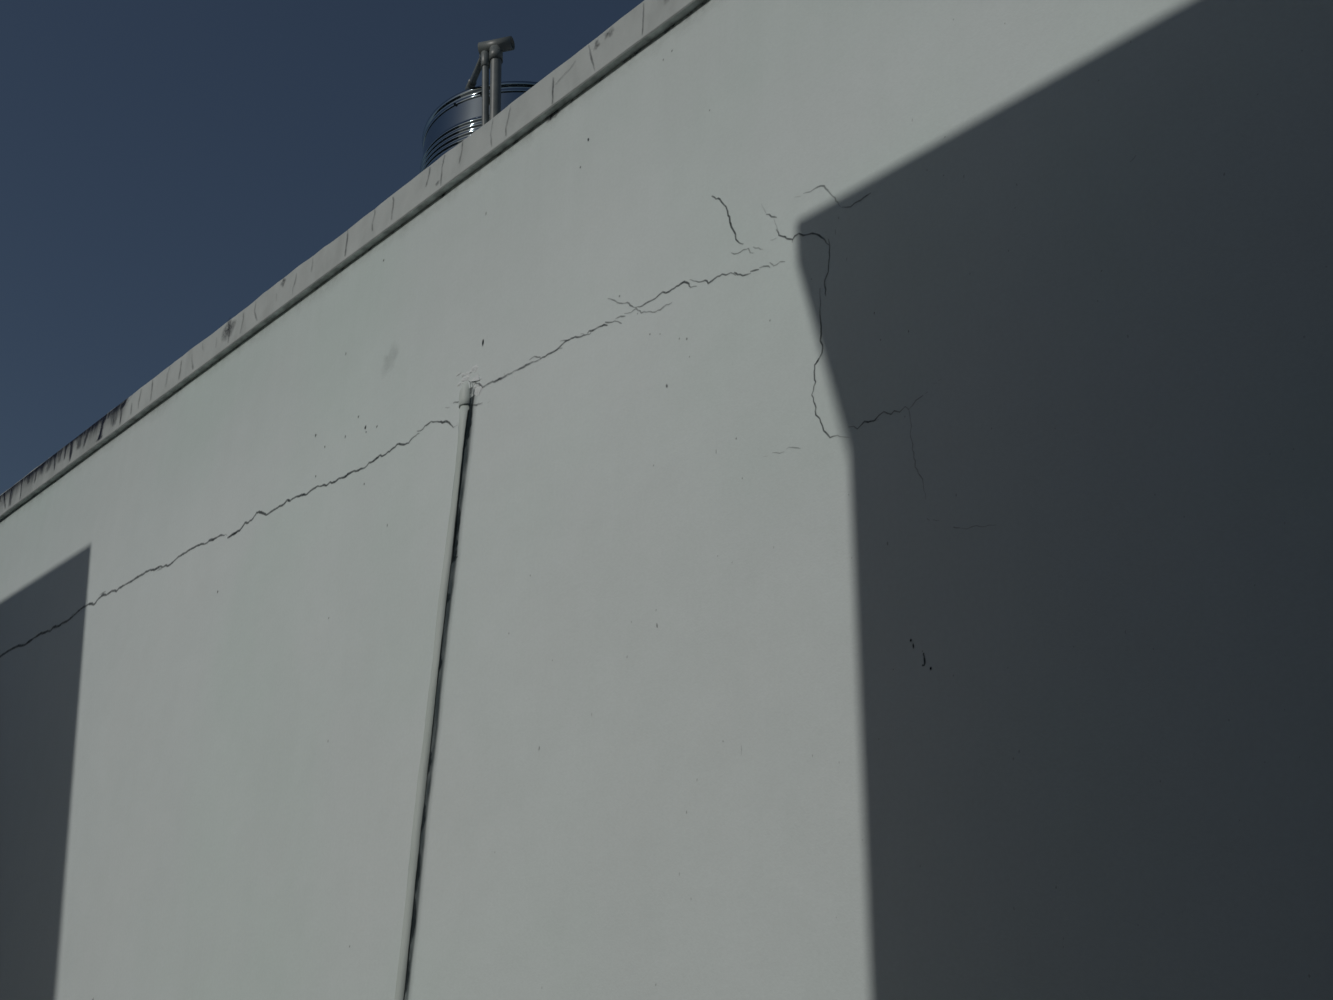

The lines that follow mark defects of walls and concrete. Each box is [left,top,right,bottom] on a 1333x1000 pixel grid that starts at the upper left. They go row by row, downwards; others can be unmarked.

crack [475,324,607,387]
crack [644,198,757,305]
crack [770,215,832,438]
crack [0,421,451,657]